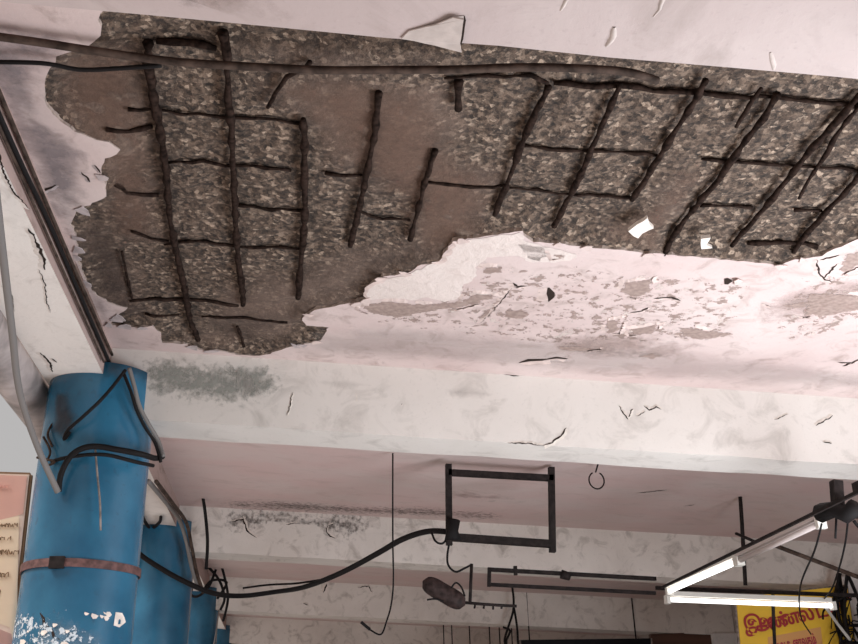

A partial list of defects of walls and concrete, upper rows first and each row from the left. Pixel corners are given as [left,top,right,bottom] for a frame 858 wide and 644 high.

spalling [45,11,858,355]
damp [149,361,272,397]
peeling [13,613,99,644]